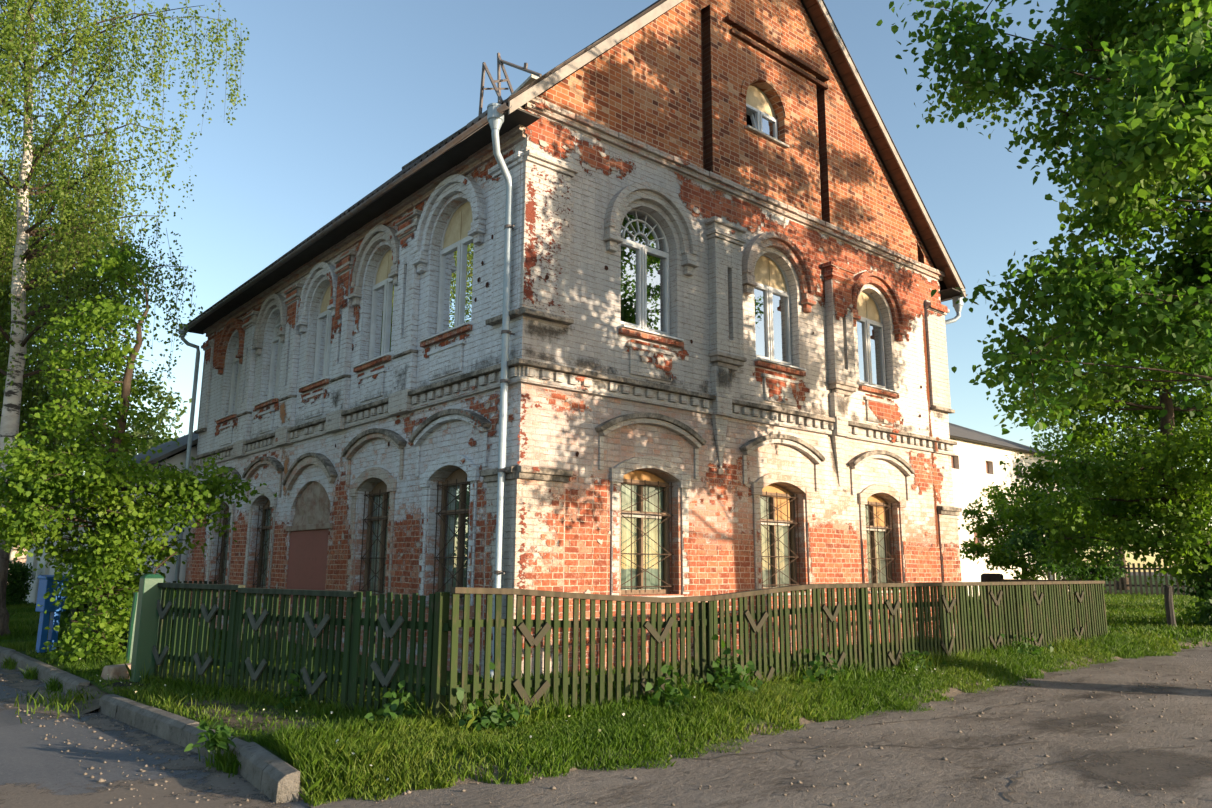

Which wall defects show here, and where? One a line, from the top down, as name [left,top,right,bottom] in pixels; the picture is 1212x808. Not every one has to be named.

peeling [326,240,363,351]
peeling [523,102,636,315]
peeling [675,160,948,341]
peeling [395,404,435,446]
peeling [752,366,810,411]
peeling [322,471,351,633]
peeling [384,506,428,642]
peeling [455,376,592,658]
peeling [514,475,623,661]
peeling [676,457,763,648]